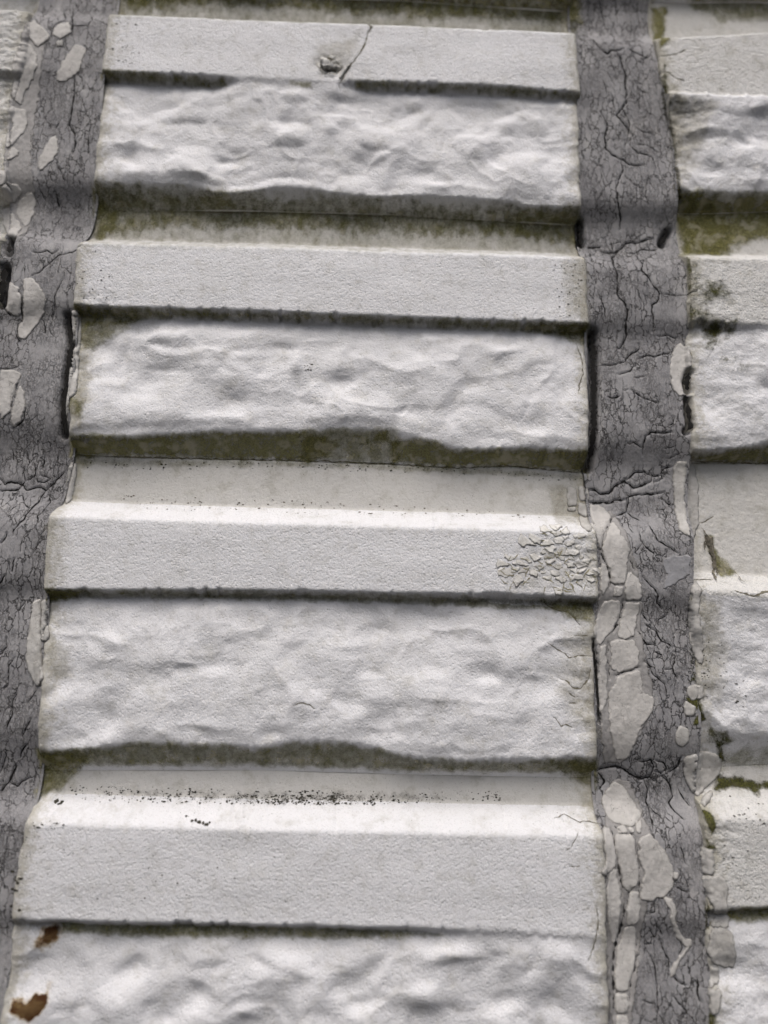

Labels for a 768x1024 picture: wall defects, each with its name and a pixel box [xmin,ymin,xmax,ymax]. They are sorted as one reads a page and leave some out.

peeling [0,20,86,244]
water stain [681,207,731,290]
peeling [5,278,47,339]
crack [0,1,768,728]
peeling [670,343,692,396]
water stain [189,429,588,481]
crack [0,599,36,792]
water stain [36,750,443,826]
corrosion [35,924,61,948]
crack [554,759,700,1020]
peeling [601,779,679,1024]
corrosion [10,993,48,1022]